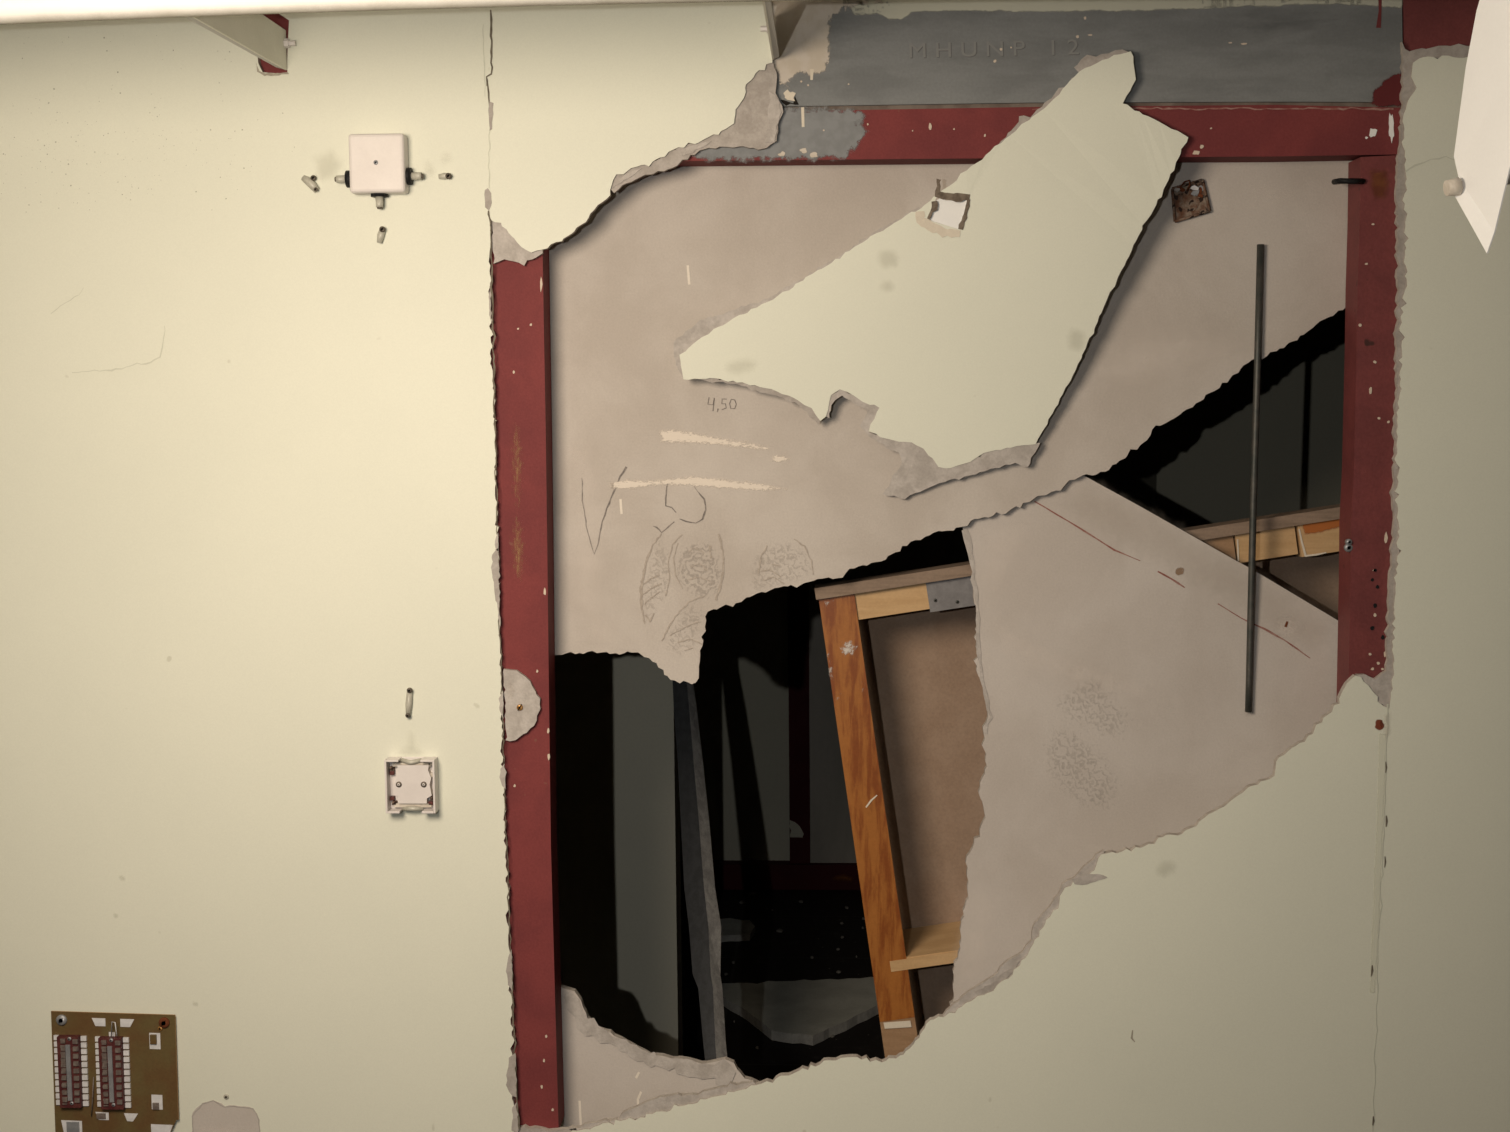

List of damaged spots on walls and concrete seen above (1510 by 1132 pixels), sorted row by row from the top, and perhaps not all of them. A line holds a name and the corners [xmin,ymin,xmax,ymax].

peeling [765,89,799,143]
crack [482,10,520,1129]
flaking render [491,534,523,626]
spalling [962,529,993,734]
flaking render [499,764,507,789]
peeling [789,820,804,837]
peeling [1072,874,1107,885]
crack [1371,704,1389,1130]
peeling [975,961,1019,996]
spalling [564,991,736,1086]
flaking render [506,1053,519,1132]